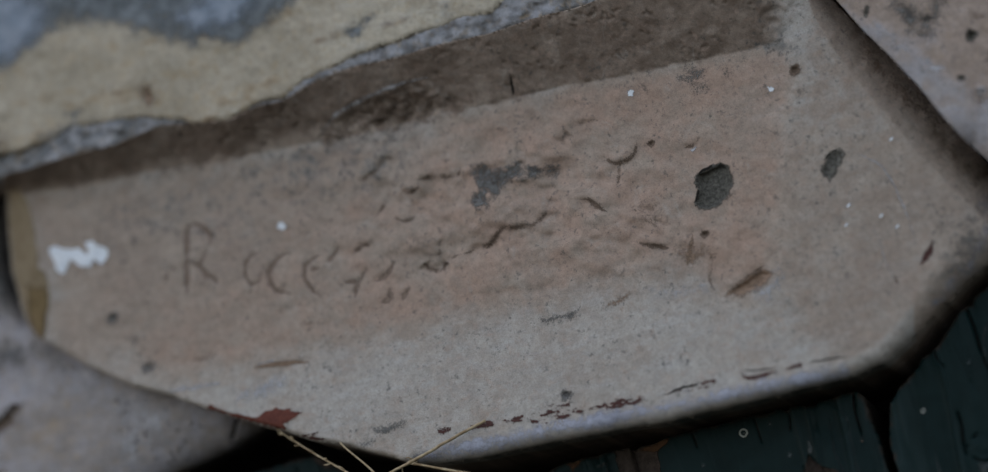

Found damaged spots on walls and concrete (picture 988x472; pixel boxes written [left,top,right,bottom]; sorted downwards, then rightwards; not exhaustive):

spalling [694,162,733,210]
peeling [614,438,668,472]